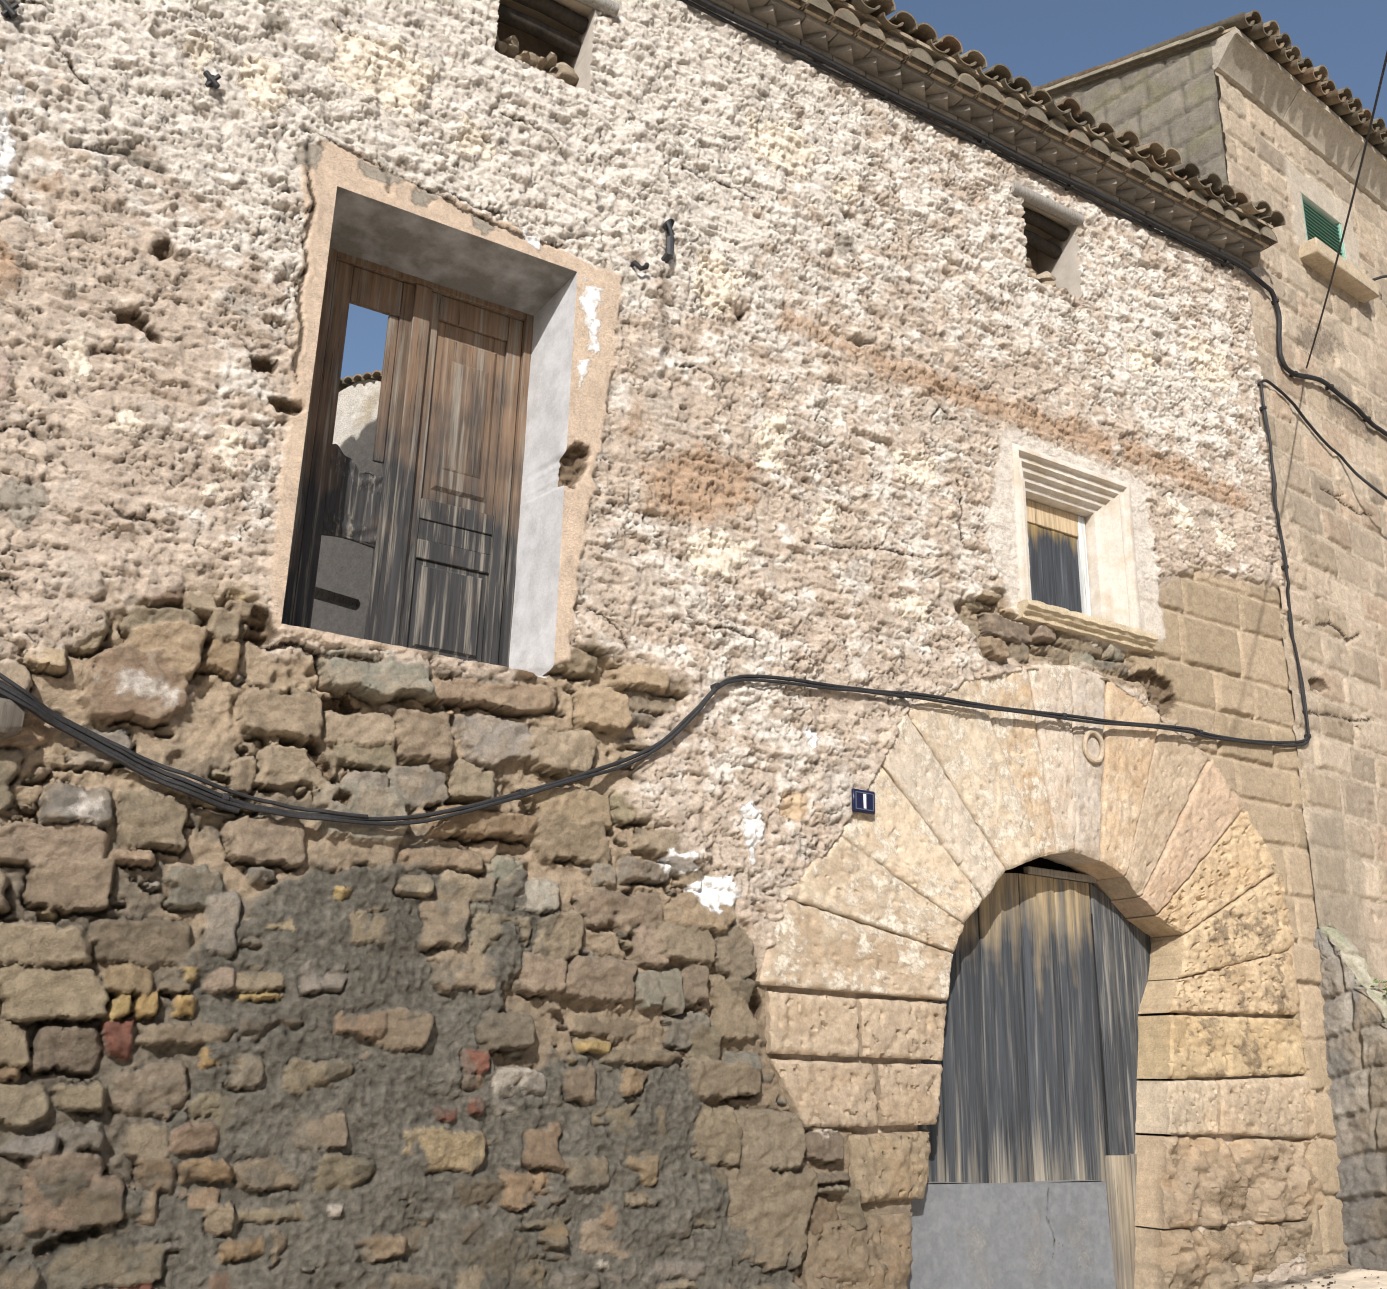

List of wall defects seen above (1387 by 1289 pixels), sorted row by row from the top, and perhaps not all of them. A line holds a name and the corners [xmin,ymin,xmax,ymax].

crack [7,0,102,101]
crack [305,129,563,249]
crack [292,170,316,384]
spalling [558,445,588,489]
crack [956,480,964,544]
crack [803,540,923,559]
crack [1315,614,1359,642]
spalling [1126,669,1174,716]
peeling [657,848,741,914]